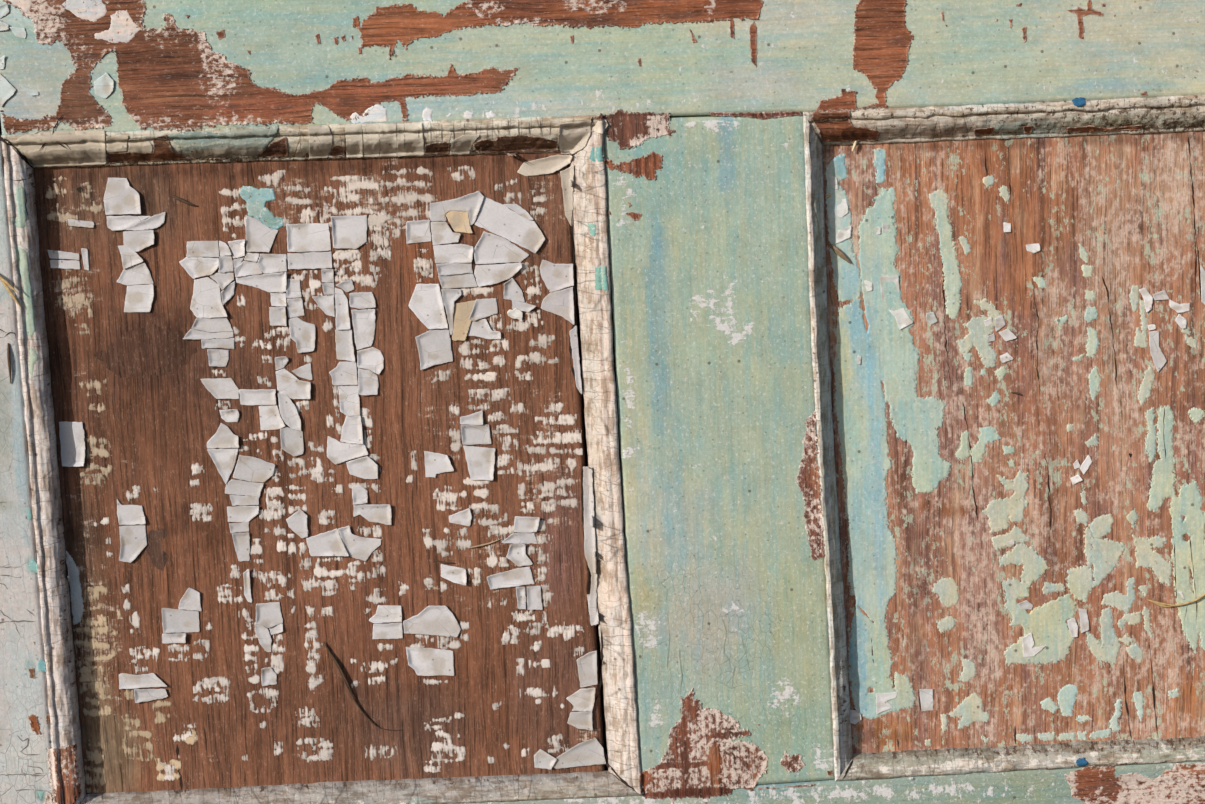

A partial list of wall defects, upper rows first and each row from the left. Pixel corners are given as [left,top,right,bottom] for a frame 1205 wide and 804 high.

peeling [315,0,764,68]
peeling [709,0,914,142]
crack [0,115,71,219]
peeling [0,0,676,313]
peeling [406,191,582,394]
peeling [179,215,392,652]
peeling [424,410,496,481]
crack [0,567,34,633]
peeling [369,605,461,676]
crack [0,736,44,804]
peeling [534,651,606,770]
peeling [639,688,816,804]